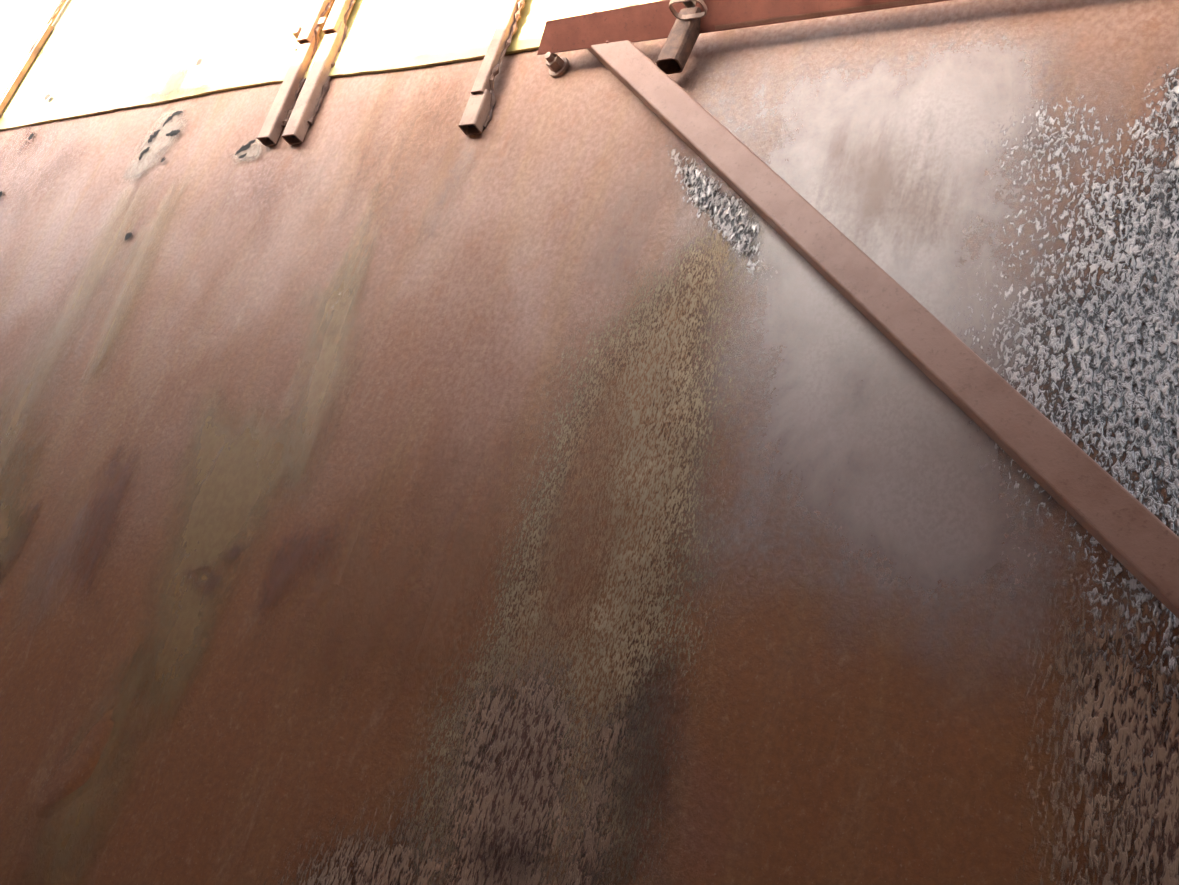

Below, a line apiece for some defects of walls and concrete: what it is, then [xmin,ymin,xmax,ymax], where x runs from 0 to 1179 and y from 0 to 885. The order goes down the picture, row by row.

spalling [139,111,183,160]